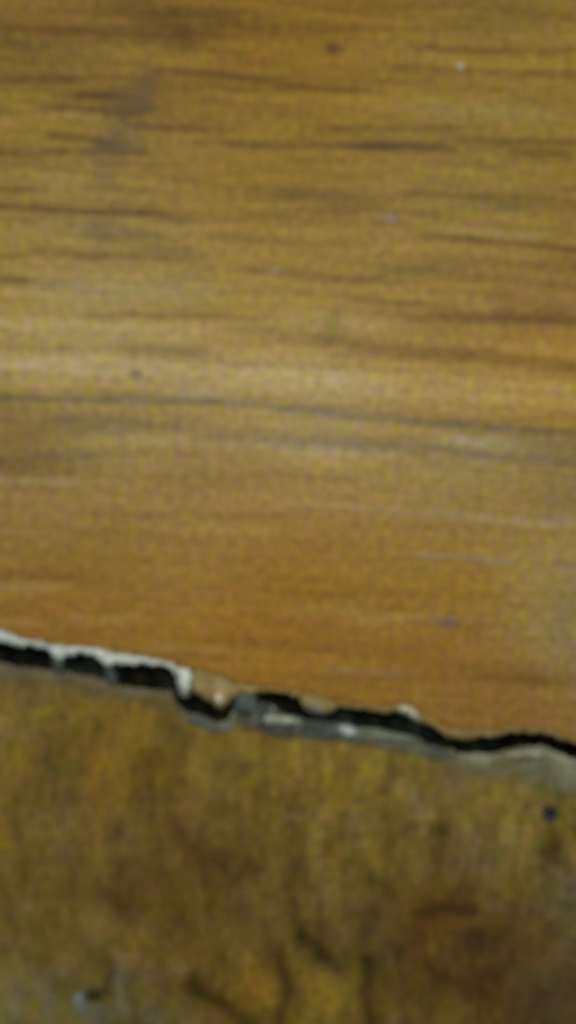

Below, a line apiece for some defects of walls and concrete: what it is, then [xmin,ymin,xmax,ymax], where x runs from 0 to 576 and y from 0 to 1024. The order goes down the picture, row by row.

crack [0,642,576,759]